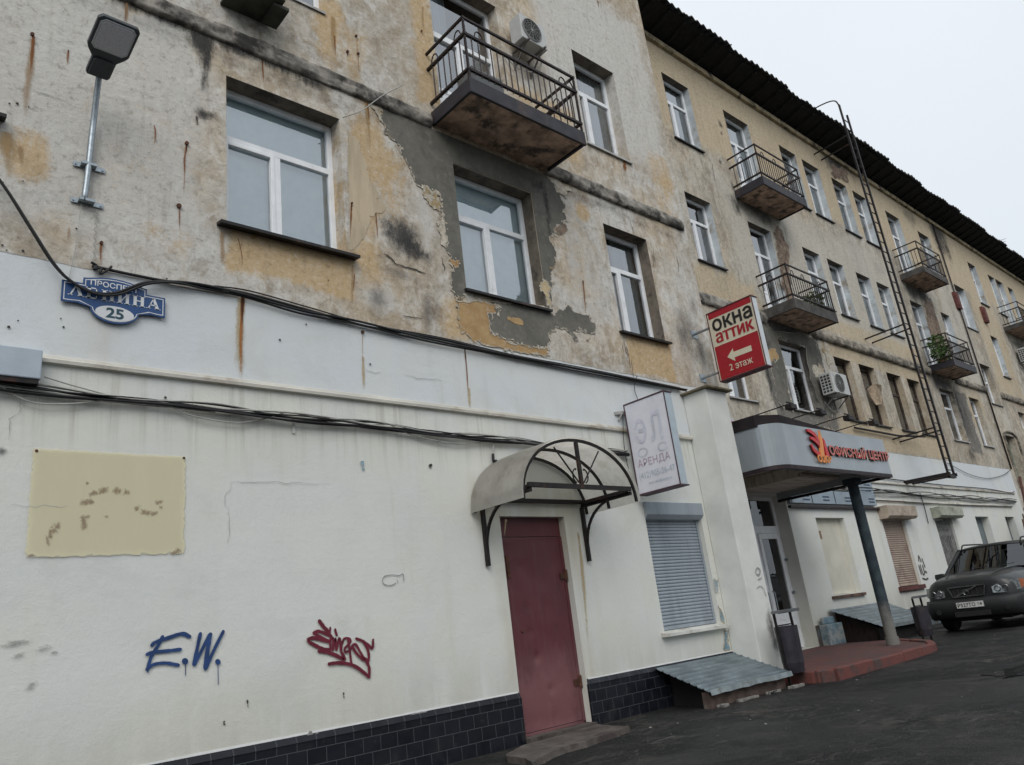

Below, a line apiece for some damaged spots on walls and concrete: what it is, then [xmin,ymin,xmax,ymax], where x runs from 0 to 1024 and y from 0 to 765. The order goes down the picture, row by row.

rust [25,32,35,98]
water stain [112,0,251,85]
water stain [264,60,324,90]
flaking render [368,102,596,357]
rust [237,297,245,369]